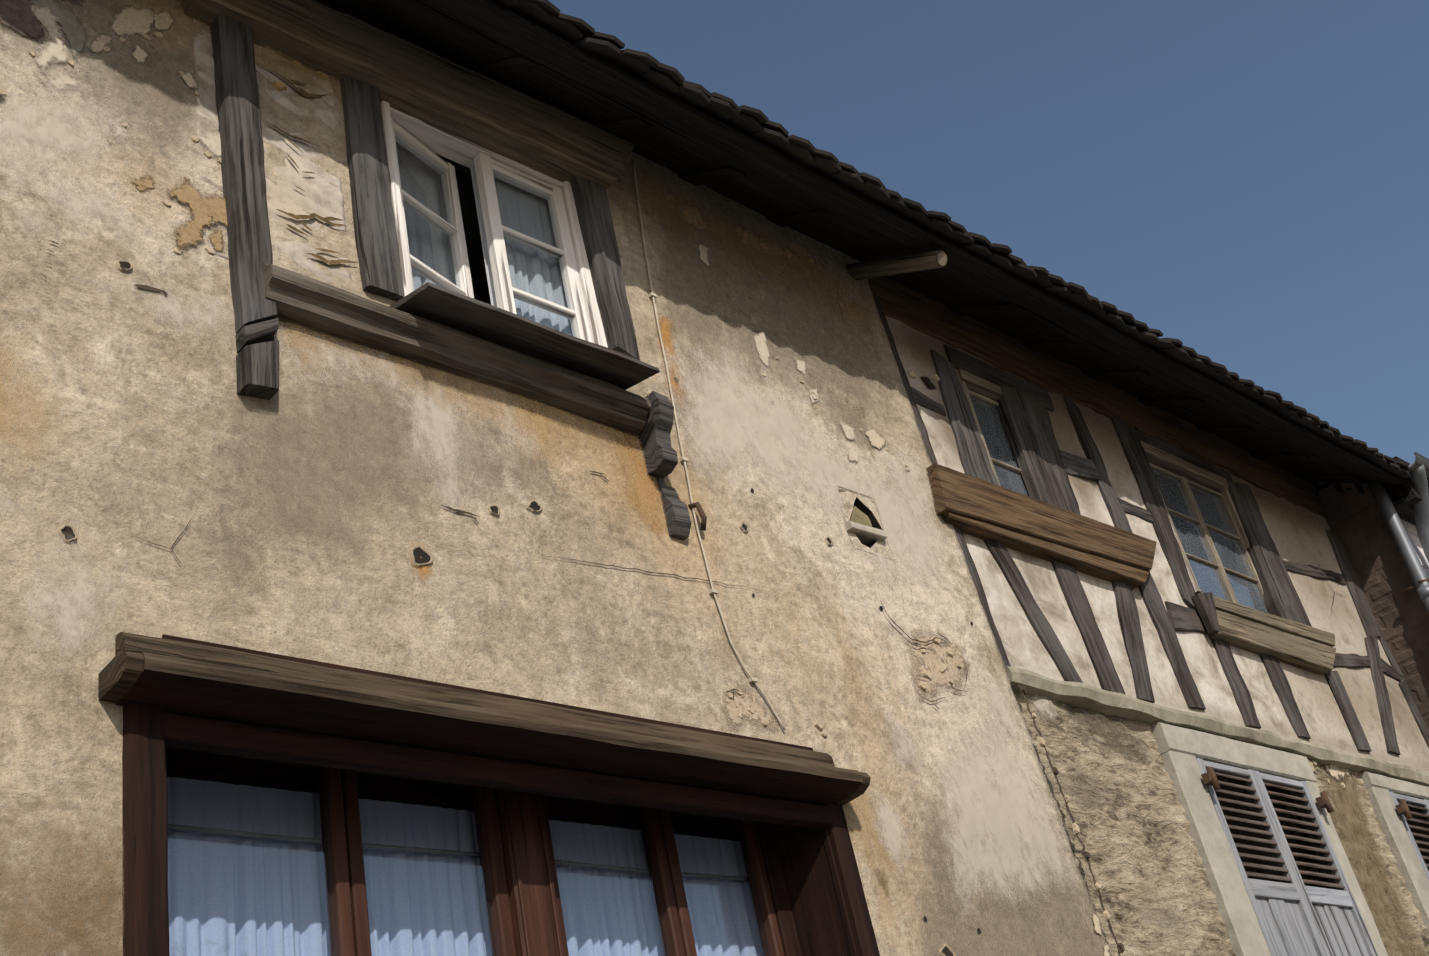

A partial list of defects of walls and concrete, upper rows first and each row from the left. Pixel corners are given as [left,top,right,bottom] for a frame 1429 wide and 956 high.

peeling [29,0,174,91]
peeling [131,175,228,255]
peeling [699,244,709,266]
peeling [754,332,779,378]
peeling [796,359,819,403]
spalling [906,629,969,701]
crack [1017,683,1125,956]